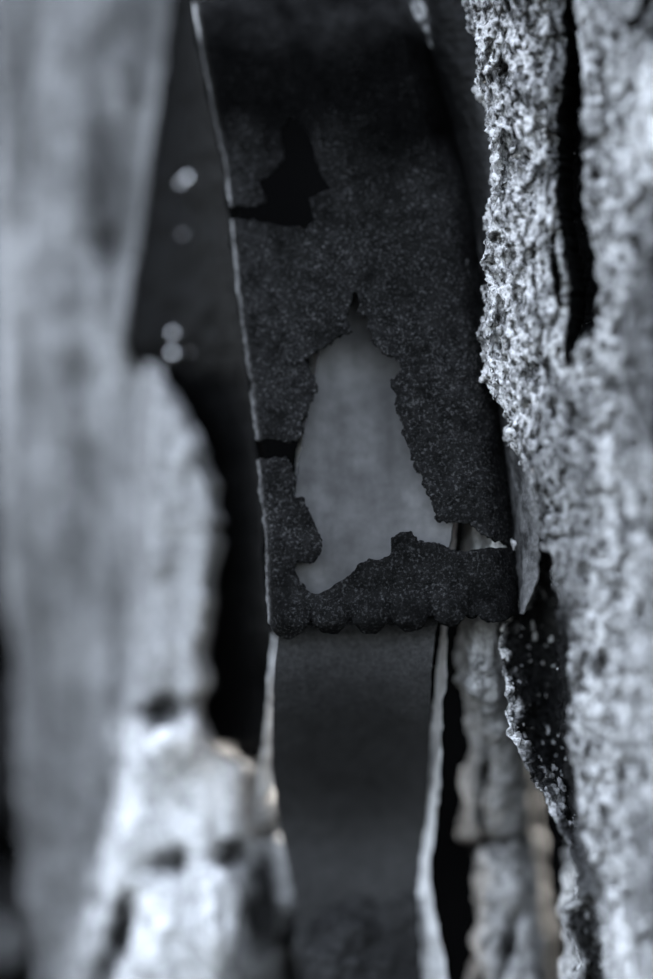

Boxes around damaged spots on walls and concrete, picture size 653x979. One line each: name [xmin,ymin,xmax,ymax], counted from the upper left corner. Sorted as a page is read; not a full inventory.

crack [545,0,602,368]
crack [622,0,653,31]
peeling [257,633,279,809]
peeling [417,625,447,979]
spalling [490,539,516,549]
spalling [500,504,613,979]